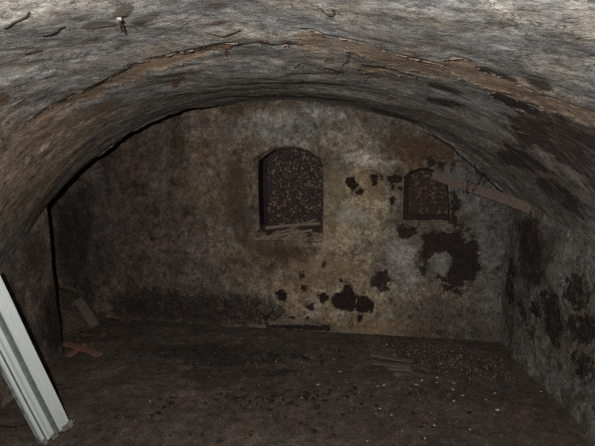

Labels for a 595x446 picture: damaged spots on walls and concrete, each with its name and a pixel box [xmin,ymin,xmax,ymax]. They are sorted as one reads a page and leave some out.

flaking render [27,43,238,125]
flaking render [292,29,595,220]